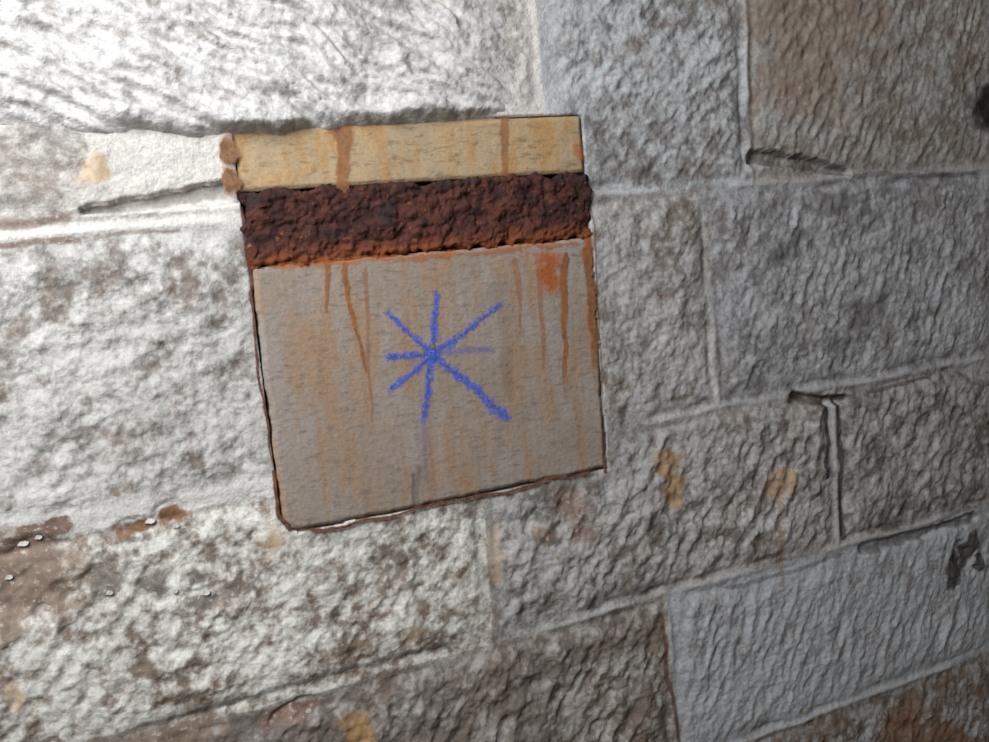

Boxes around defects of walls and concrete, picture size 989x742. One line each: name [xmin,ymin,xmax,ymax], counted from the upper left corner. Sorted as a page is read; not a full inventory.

crack [789,393,846,540]